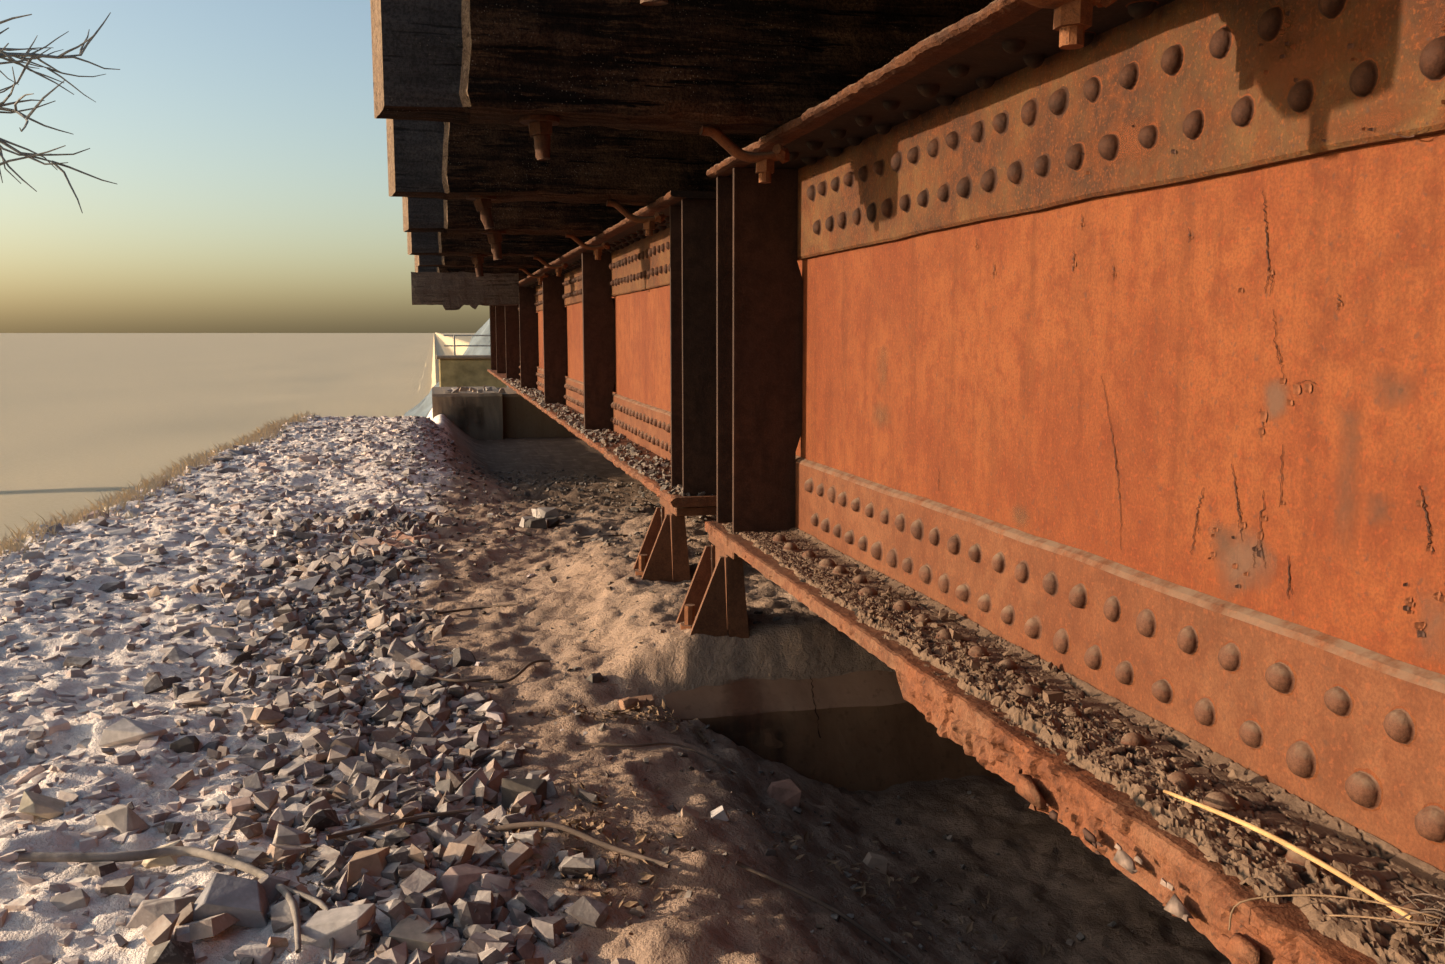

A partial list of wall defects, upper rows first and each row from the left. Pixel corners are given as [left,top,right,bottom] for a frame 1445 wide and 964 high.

corrosion [1103,125,1145,160]
peeling [1208,528,1263,588]
corrosion [1014,766,1048,811]
corrosion [1113,843,1143,874]
corrosion [1160,878,1194,922]
corrosion [1216,933,1260,964]